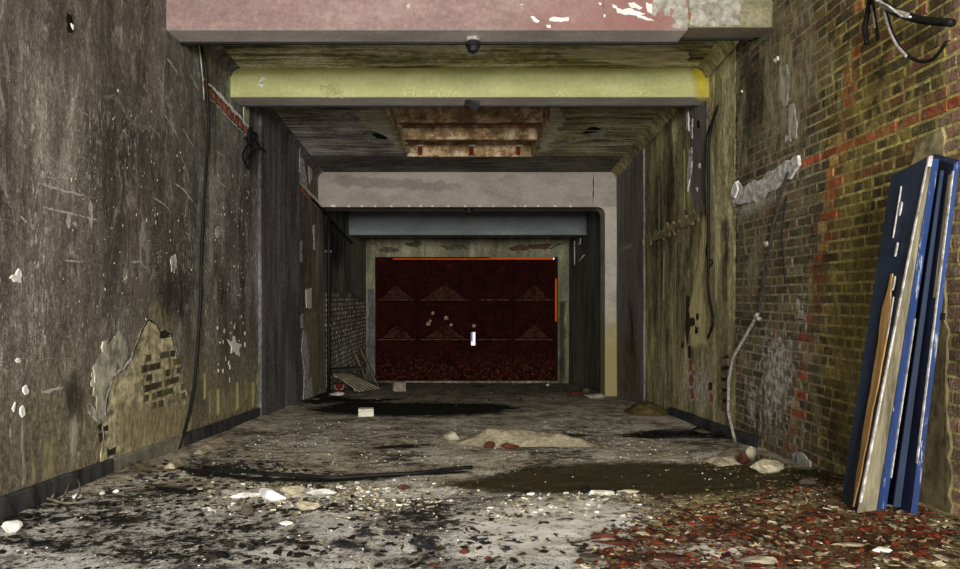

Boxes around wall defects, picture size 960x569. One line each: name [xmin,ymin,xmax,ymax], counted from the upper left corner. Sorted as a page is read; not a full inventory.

peeling [530,16,569,28]
peeling [785,103,798,143]
spalling [87,299,192,462]
damp [749,333,795,420]